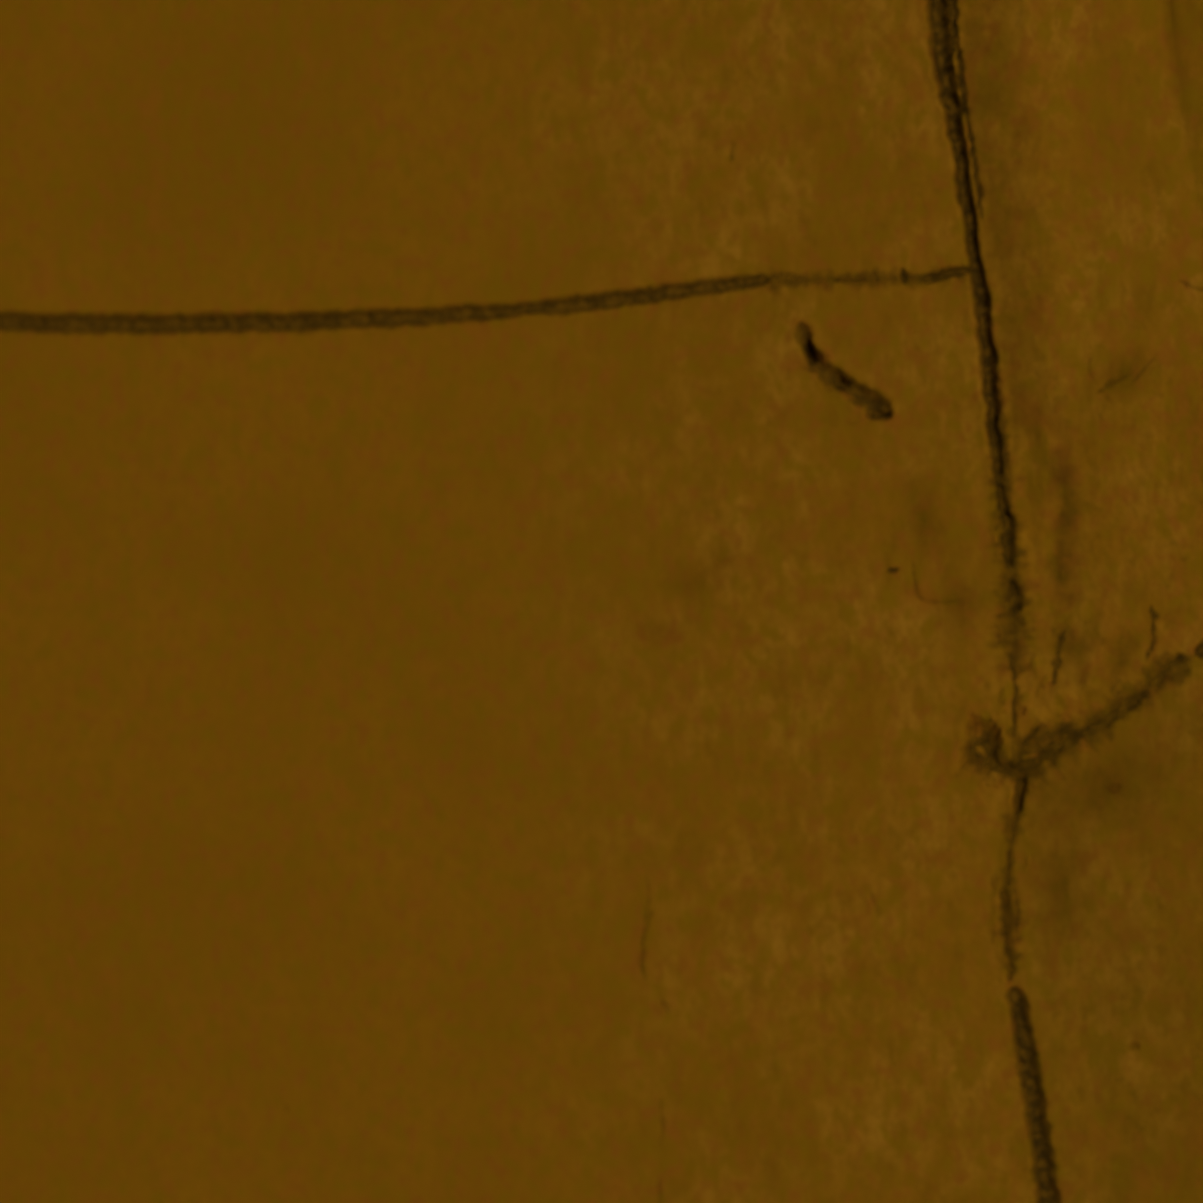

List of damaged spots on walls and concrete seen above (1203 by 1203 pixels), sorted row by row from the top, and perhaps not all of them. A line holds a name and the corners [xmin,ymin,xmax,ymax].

crack [0,274,770,334]
crack [901,0,1031,670]
crack [1038,606,1203,761]
crack [992,856,1058,1203]